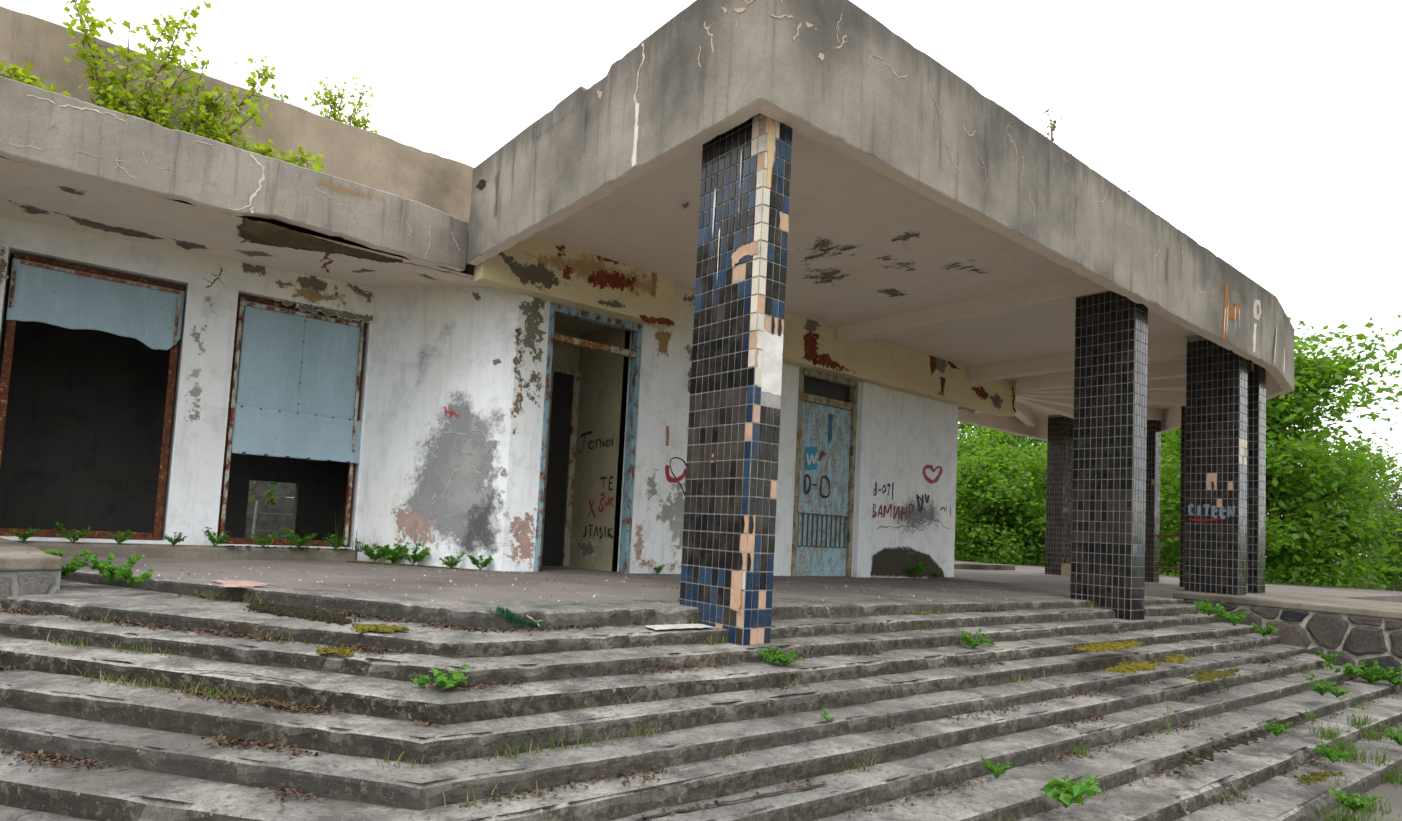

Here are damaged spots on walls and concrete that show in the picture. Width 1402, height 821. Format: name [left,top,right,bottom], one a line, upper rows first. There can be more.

crack [633,43,645,123]
crack [10,95,125,149]
peeling [8,200,208,250]
crack [406,221,473,280]
peeling [731,240,758,267]
peeling [796,237,862,286]
rust [1222,282,1241,340]
spalling [929,356,959,375]
peeling [385,245,637,569]
peeling [958,386,1003,410]
peeling [632,469,686,565]
peeling [730,570,742,614]